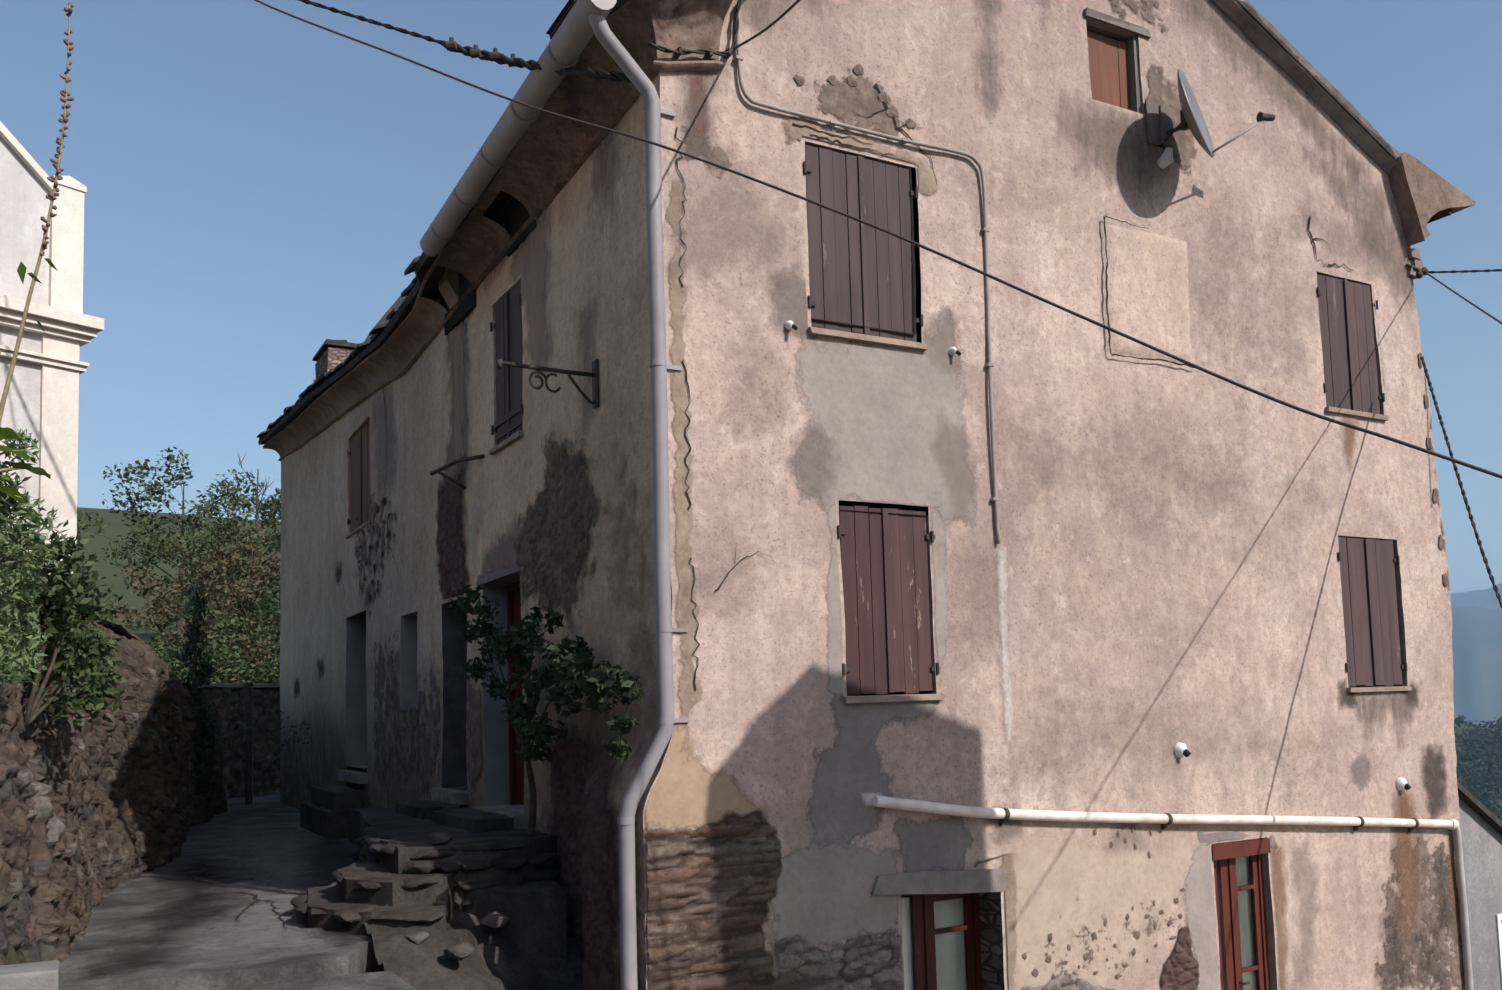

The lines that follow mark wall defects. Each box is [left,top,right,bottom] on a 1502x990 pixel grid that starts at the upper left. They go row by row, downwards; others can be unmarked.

peeling [1112,0,1169,31]
peeling [784,63,937,195]
crack [1308,215,1358,274]
peeling [355,489,396,616]
flaking render [514,433,607,629]
crack [714,544,776,592]
flaking render [645,810,904,990]
peeling [1007,823,1200,990]
peeling [1374,834,1465,990]